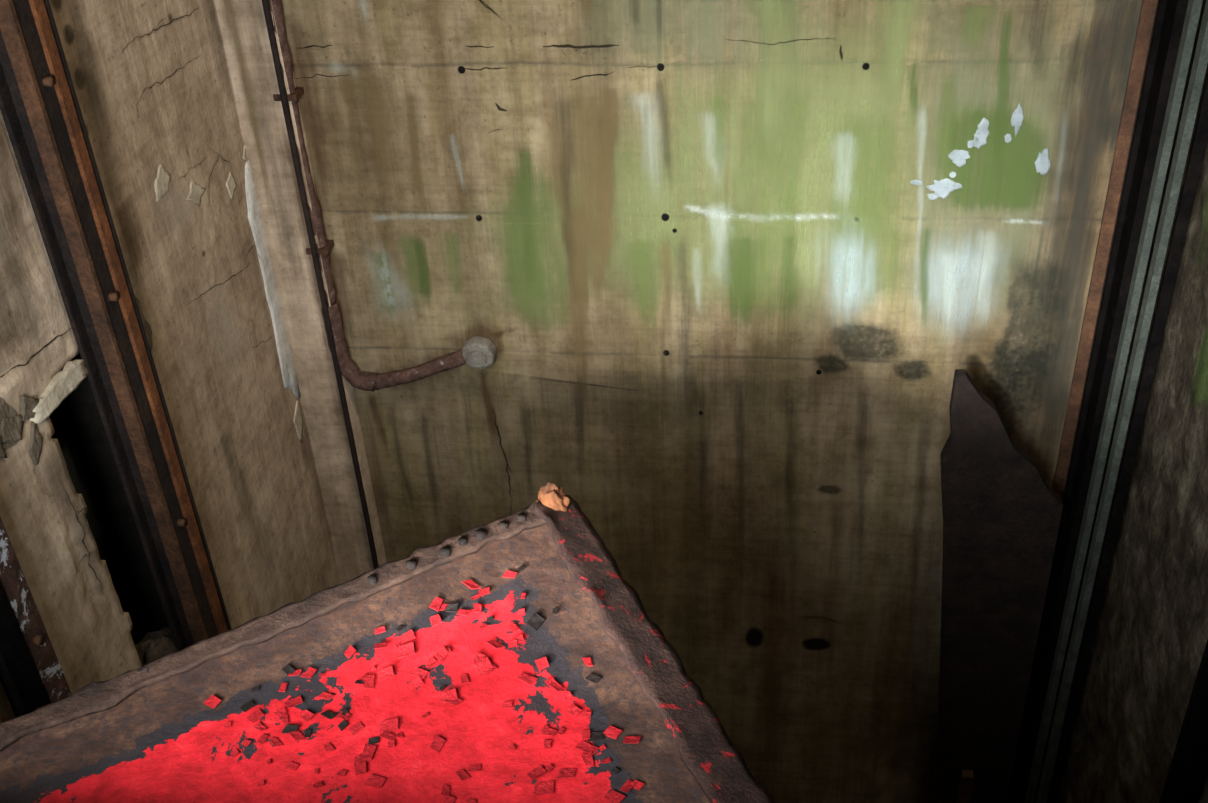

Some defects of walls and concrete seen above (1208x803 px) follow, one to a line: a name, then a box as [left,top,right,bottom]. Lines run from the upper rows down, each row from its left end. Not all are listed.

crack [121,9,196,54]
crack [136,57,198,118]
peeling [1004,103,1024,143]
peeling [910,118,990,200]
peeling [1034,148,1050,176]
spalling [0,359,89,465]
peeling [502,566,525,578]
peeling [355,625,452,690]
peeling [429,580,558,706]
peeling [203,695,221,709]
peeling [230,664,404,788]
peeling [517,657,645,803]